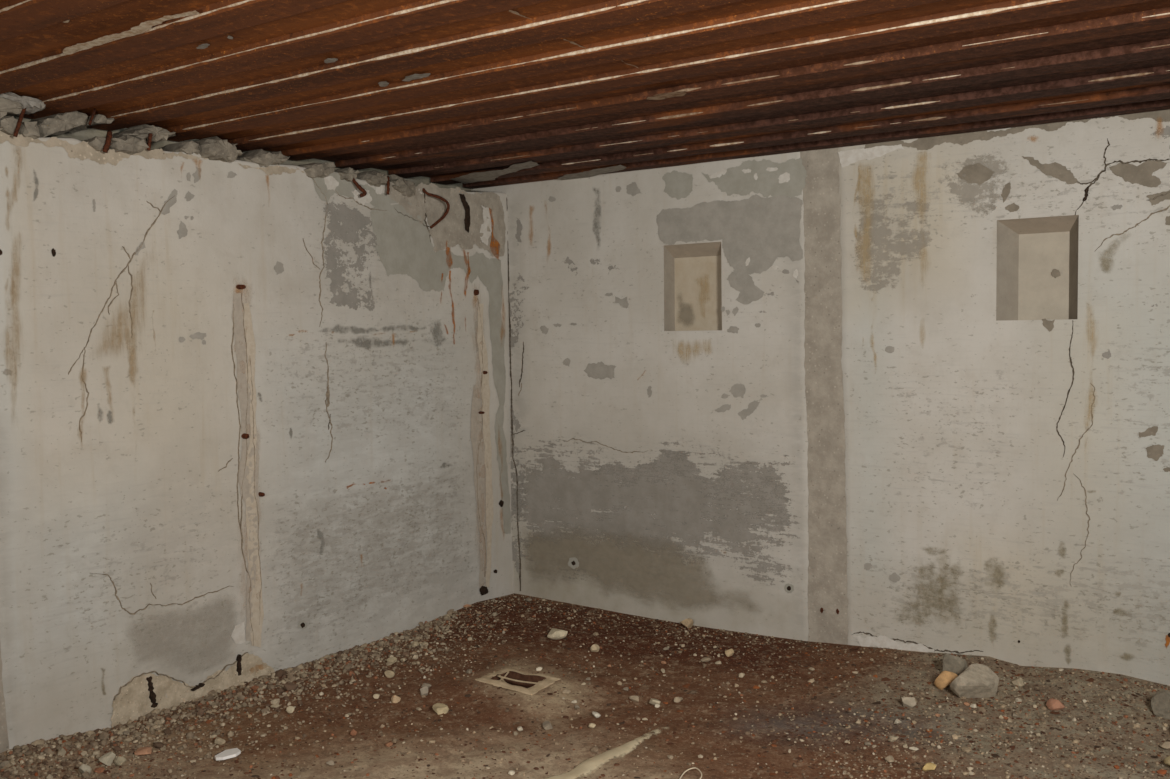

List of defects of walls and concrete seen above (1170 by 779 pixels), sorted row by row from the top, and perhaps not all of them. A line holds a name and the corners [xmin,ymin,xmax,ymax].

spalling [0,108,209,215]
rust [489,208,500,259]
peeling [947,155,1019,214]
peeling [864,109,1170,187]
crack [1075,138,1169,215]
crack [1095,190,1170,251]
crack [68,196,174,442]
rust [441,243,470,344]
peeling [227,147,935,652]
crack [1056,326,1095,587]
peeling [1139,426,1170,472]
spalling [111,652,275,728]